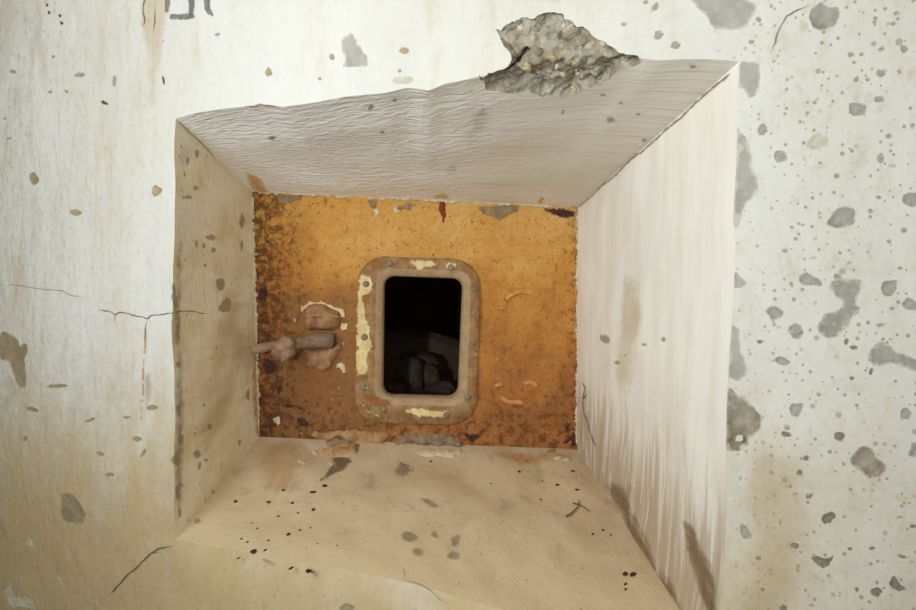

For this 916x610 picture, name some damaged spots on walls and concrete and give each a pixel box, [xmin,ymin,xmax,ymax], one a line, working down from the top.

crack [772,0,826,50]
spalling [478,12,642,97]
crack [111,546,171,593]